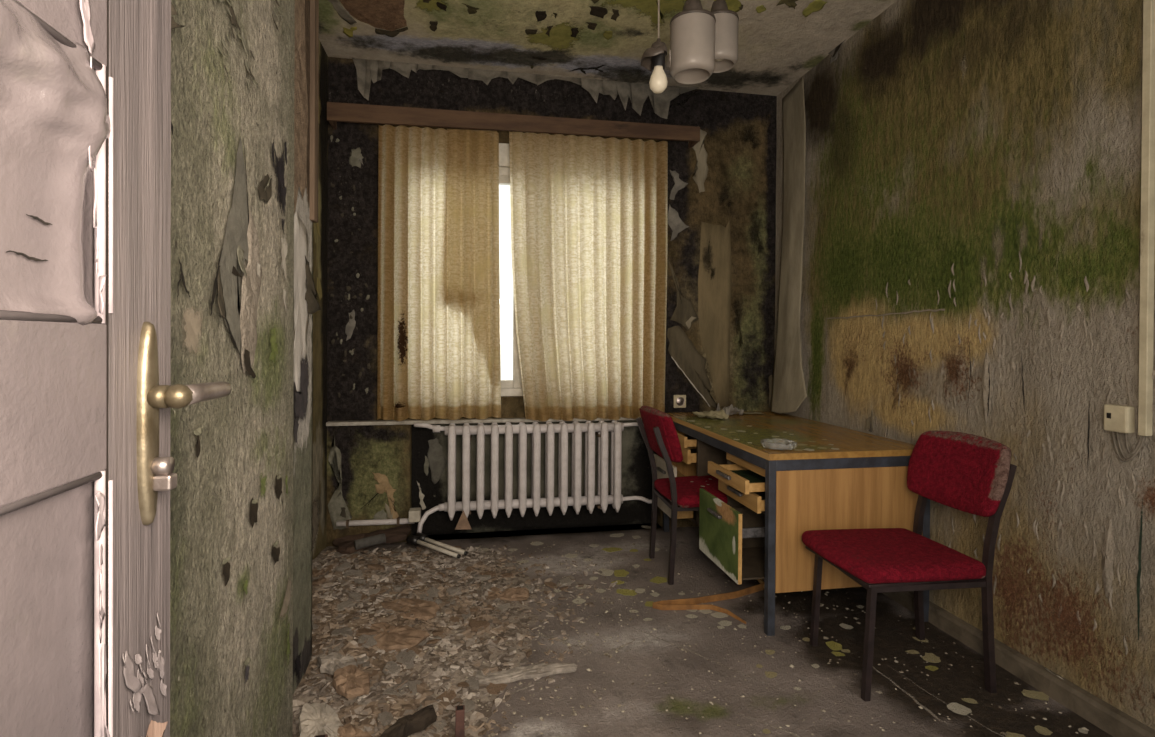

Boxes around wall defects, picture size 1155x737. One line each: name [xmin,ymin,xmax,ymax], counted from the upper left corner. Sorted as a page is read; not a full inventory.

spalling [328,0,447,37]
peeling [525,0,687,69]
peeling [714,0,827,17]
peeling [337,147,366,169]
peeling [183,137,272,378]
peeling [294,212,371,398]
peeling [122,612,168,737]